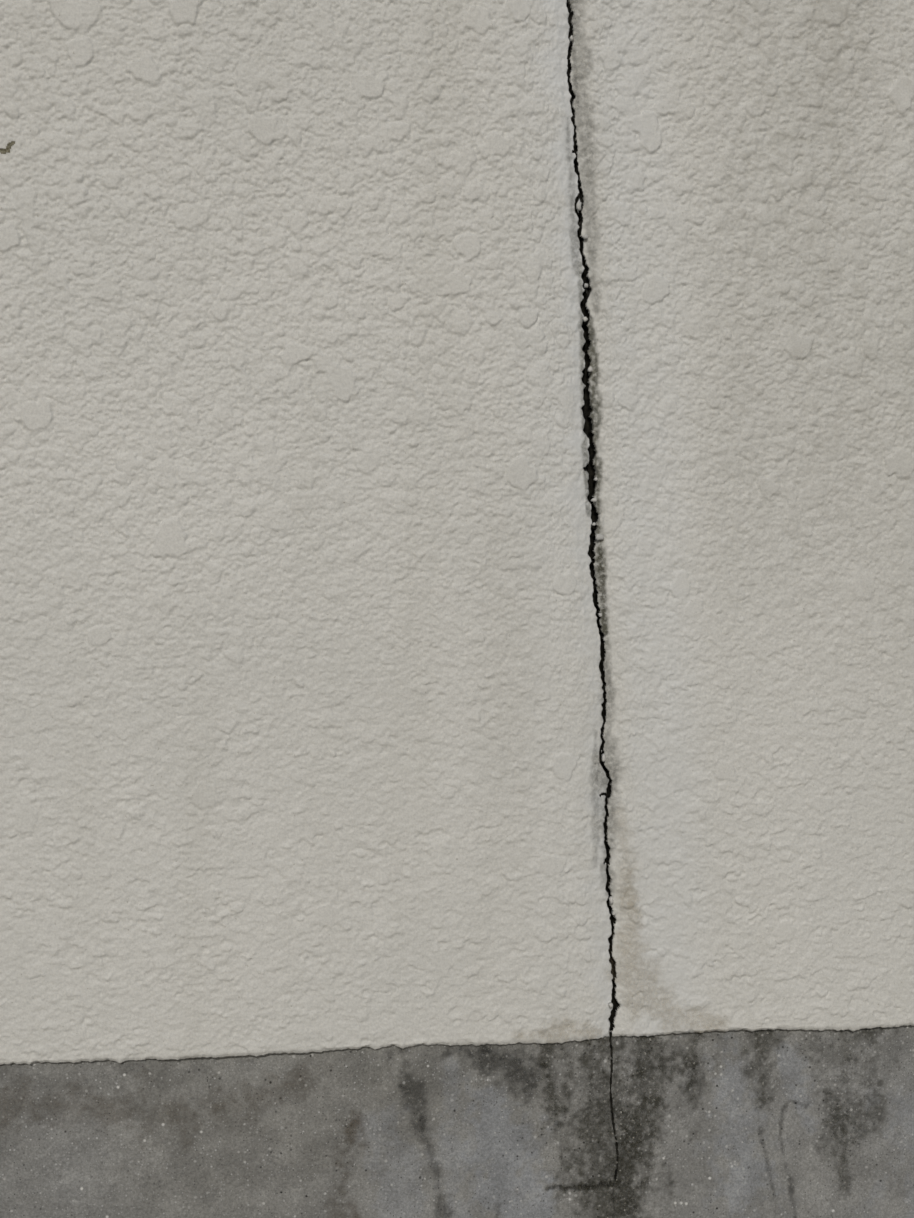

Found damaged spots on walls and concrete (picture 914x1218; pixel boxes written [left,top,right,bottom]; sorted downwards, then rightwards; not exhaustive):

crack [566,0,620,1181]
water stain [567,1100,642,1218]